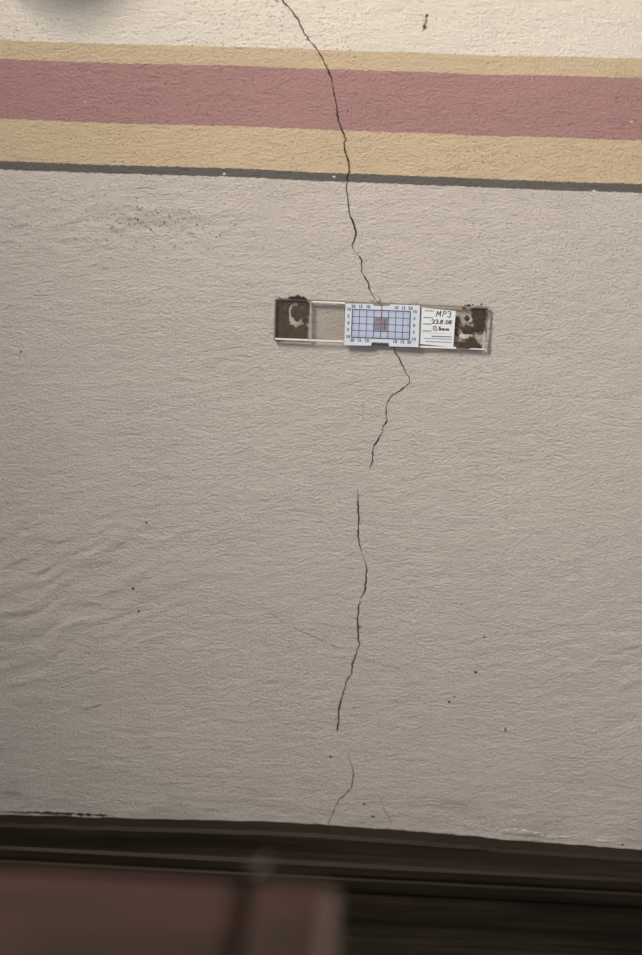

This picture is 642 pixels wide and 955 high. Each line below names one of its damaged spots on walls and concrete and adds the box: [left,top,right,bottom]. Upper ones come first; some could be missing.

crack [275,0,381,306]
crack [369,349,412,471]
crack [337,491,367,730]
crack [328,753,354,825]